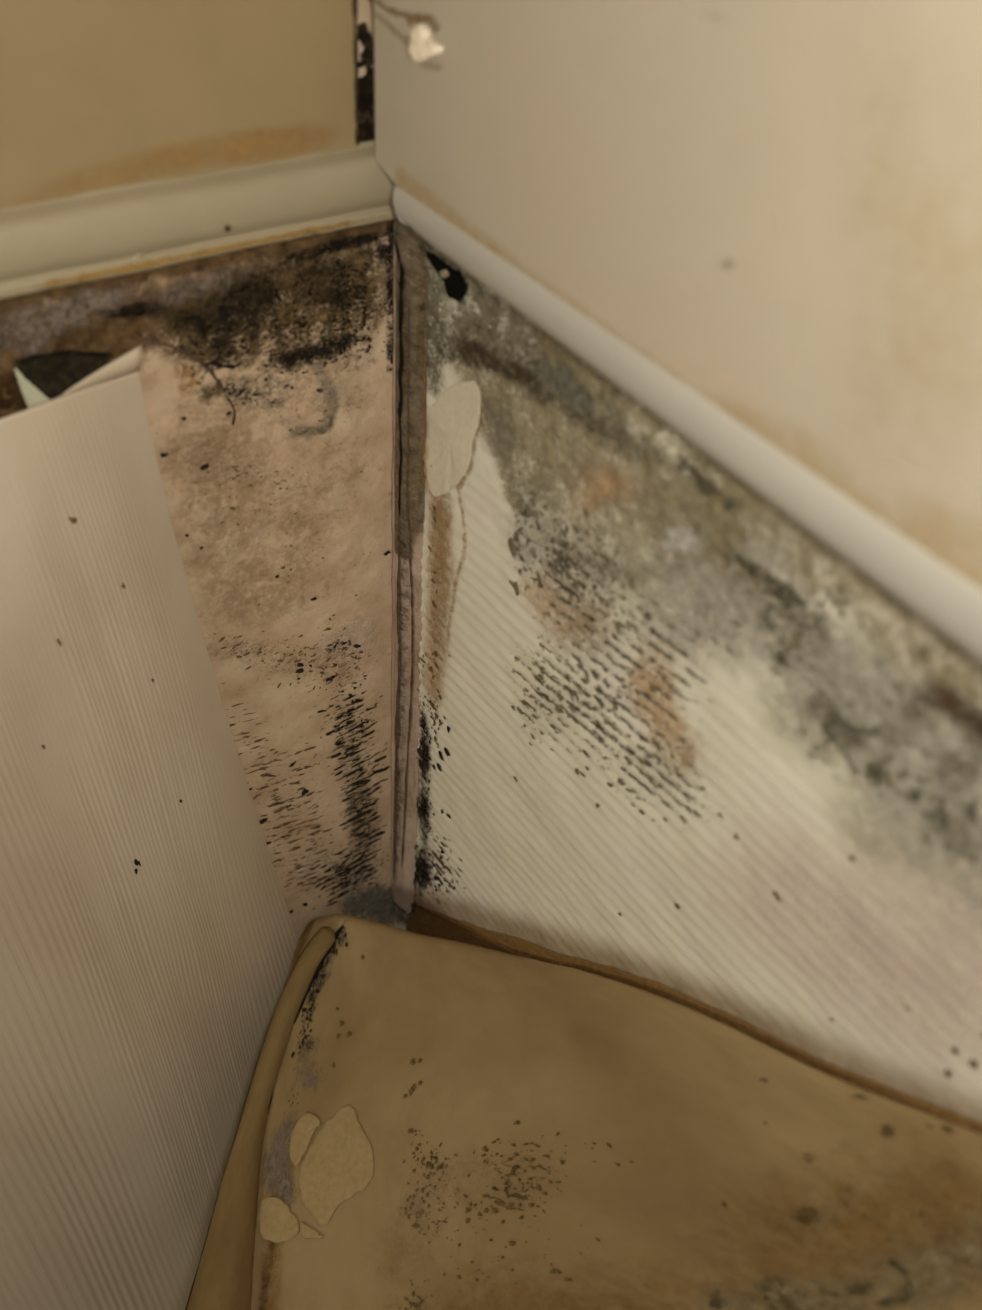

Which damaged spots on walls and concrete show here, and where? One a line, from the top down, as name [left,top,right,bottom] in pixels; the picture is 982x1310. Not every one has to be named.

spalling [426,251,468,304]
peeling [426,381,481,497]
leakage [0,216,982,1205]
flaking render [256,1105,373,1243]
leakage [382,1128,581,1310]